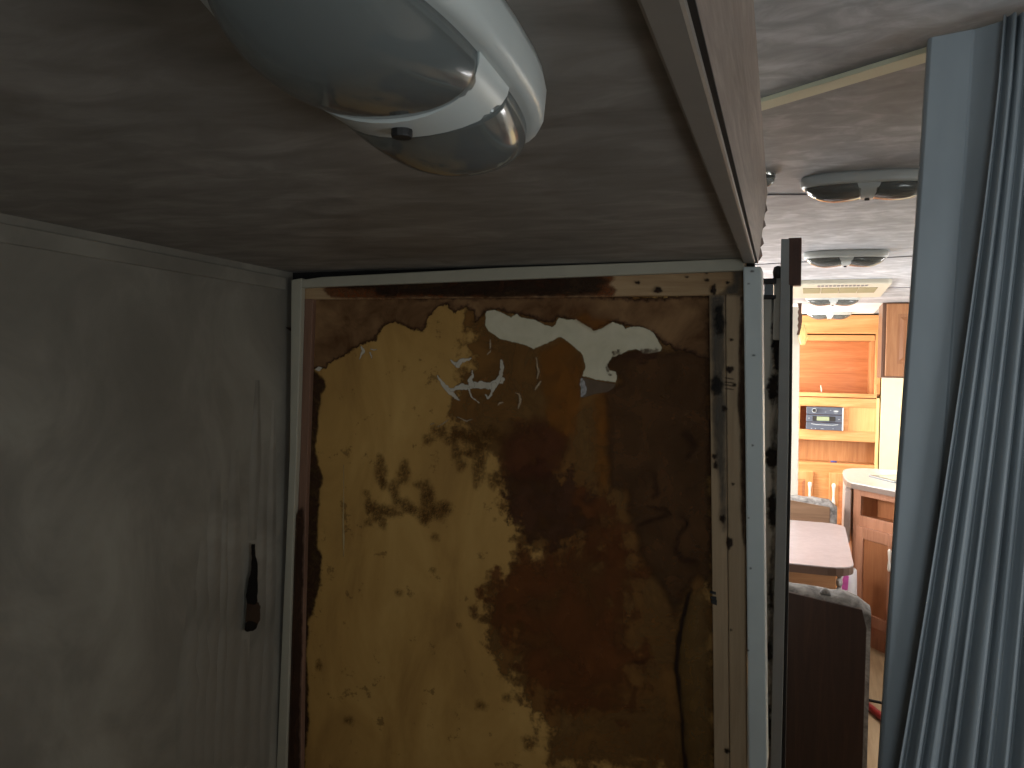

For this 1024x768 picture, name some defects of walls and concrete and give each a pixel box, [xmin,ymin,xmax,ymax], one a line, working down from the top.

water stain [288,271,746,768]
peeling [485,310,662,398]
water stain [765,323,779,768]